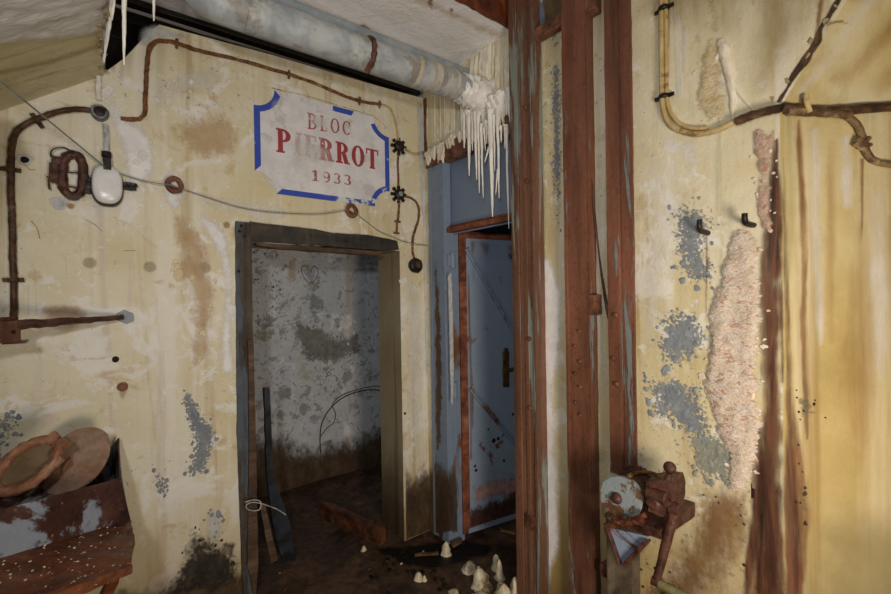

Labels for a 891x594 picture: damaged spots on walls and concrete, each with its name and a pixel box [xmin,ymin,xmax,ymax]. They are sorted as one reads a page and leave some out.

spalling [692,41,726,122]
peeling [549,64,562,232]
spalling [750,129,778,233]
corrosion [434,269,443,449]
spalling [643,196,771,491]
corrosion [746,127,807,594]
peeling [0,410,23,460]
peeling [152,468,169,498]
peeling [181,390,219,477]
damp [256,421,382,498]
corrosion [470,475,516,527]
damp [159,526,242,594]